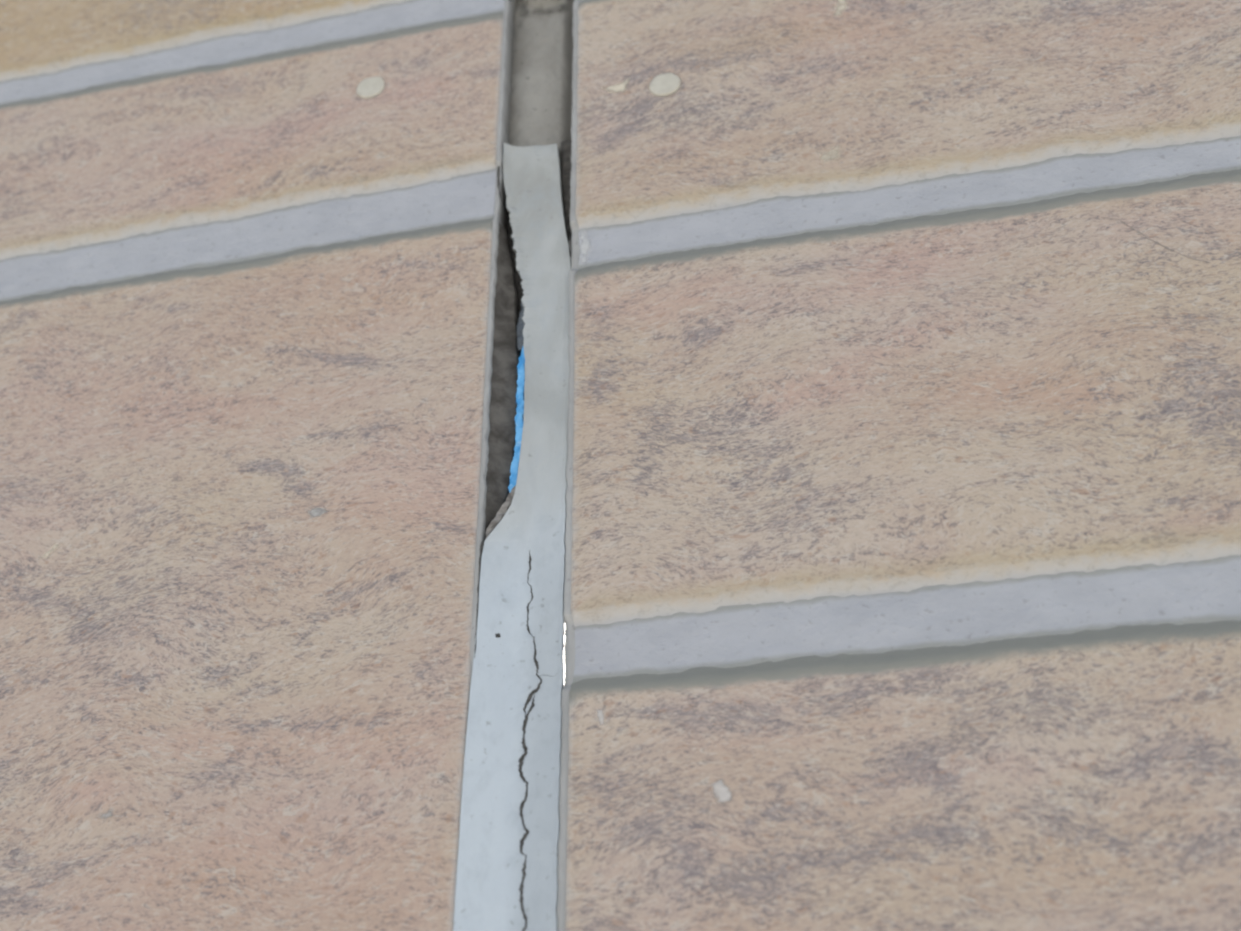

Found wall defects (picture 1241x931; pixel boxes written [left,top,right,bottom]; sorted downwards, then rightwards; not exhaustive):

crack [518,550,557,931]